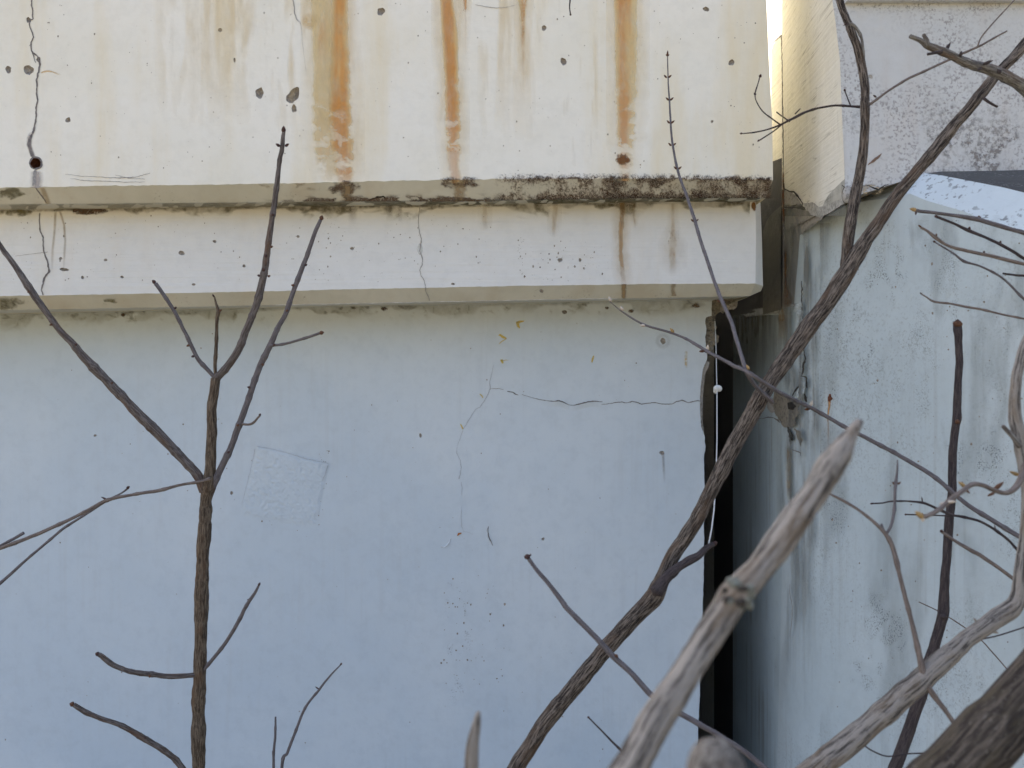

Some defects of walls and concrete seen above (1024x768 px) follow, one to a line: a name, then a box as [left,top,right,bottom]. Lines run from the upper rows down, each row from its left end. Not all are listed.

crack [17,0,50,295]
corrosion [312,0,353,174]
crack [418,208,430,301]
corrosion [440,0,467,151]
leakage [277,198,760,214]
corrosion [614,0,637,164]
crack [456,369,699,533]